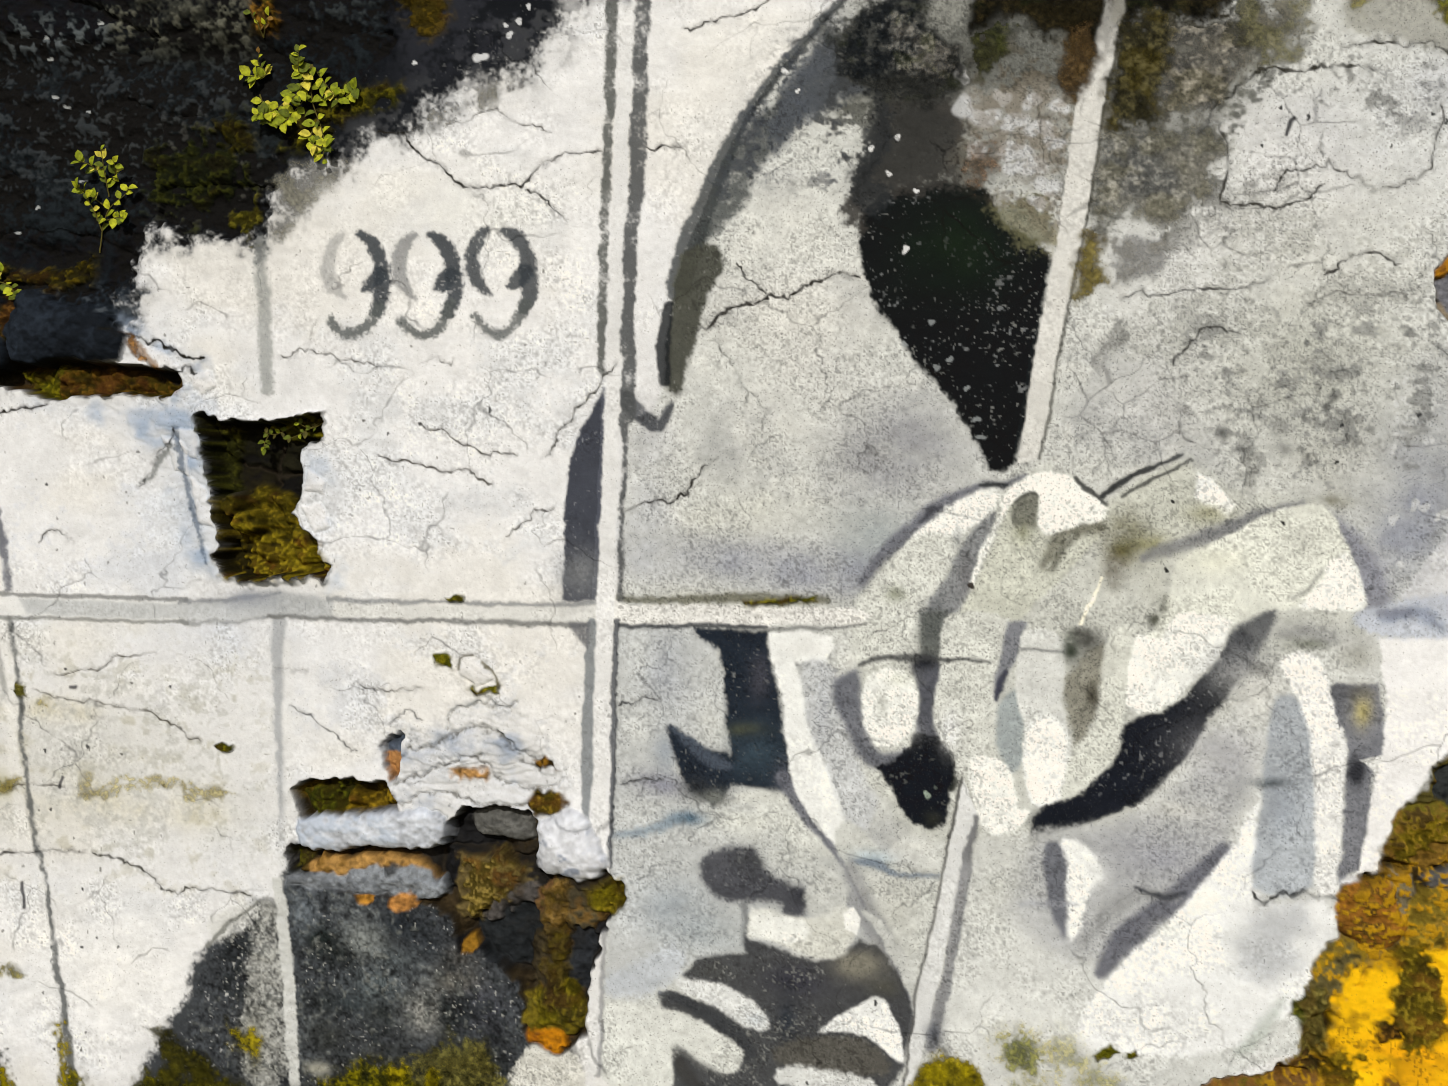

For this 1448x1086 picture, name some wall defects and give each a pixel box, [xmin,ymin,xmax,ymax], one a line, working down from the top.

crack [378,108,599,208]
crack [1214,40,1396,209]
spalling [0,0,449,594]
crack [708,263,860,351]
spalling [1434,257,1448,321]
crack [93,853,202,892]
spalling [283,653,629,1057]
spalling [1201,754,1448,1086]